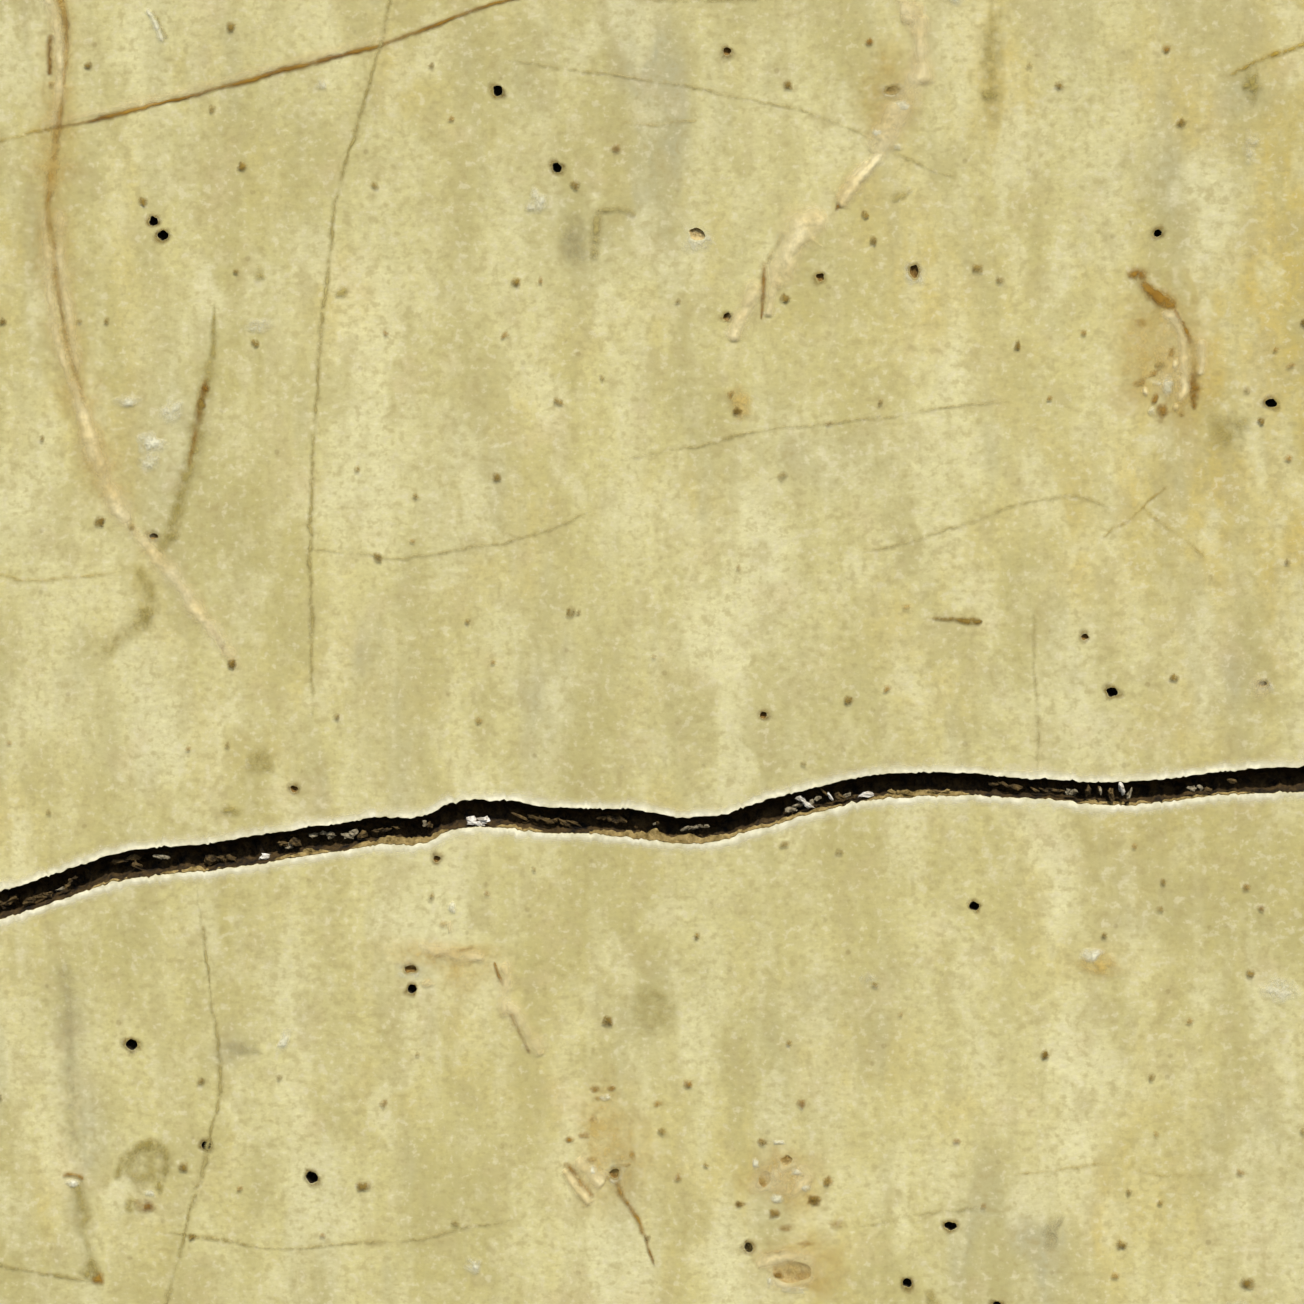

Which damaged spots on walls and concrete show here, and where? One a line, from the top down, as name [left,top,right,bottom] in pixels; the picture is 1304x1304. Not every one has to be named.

crack [33,0,510,681]
crack [0,760,1304,925]
crack [181,1024,222,1247]